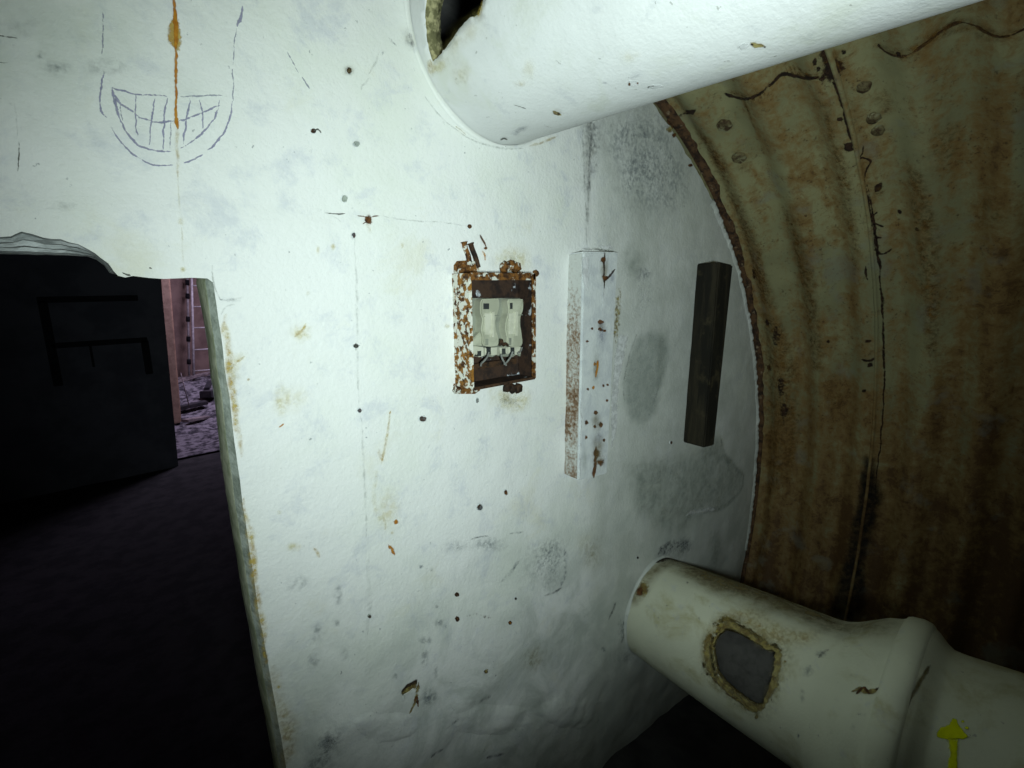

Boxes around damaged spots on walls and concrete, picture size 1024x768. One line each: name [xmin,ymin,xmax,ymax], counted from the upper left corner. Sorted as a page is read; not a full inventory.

rust [168,0,181,129]
rust [864,209,892,280]